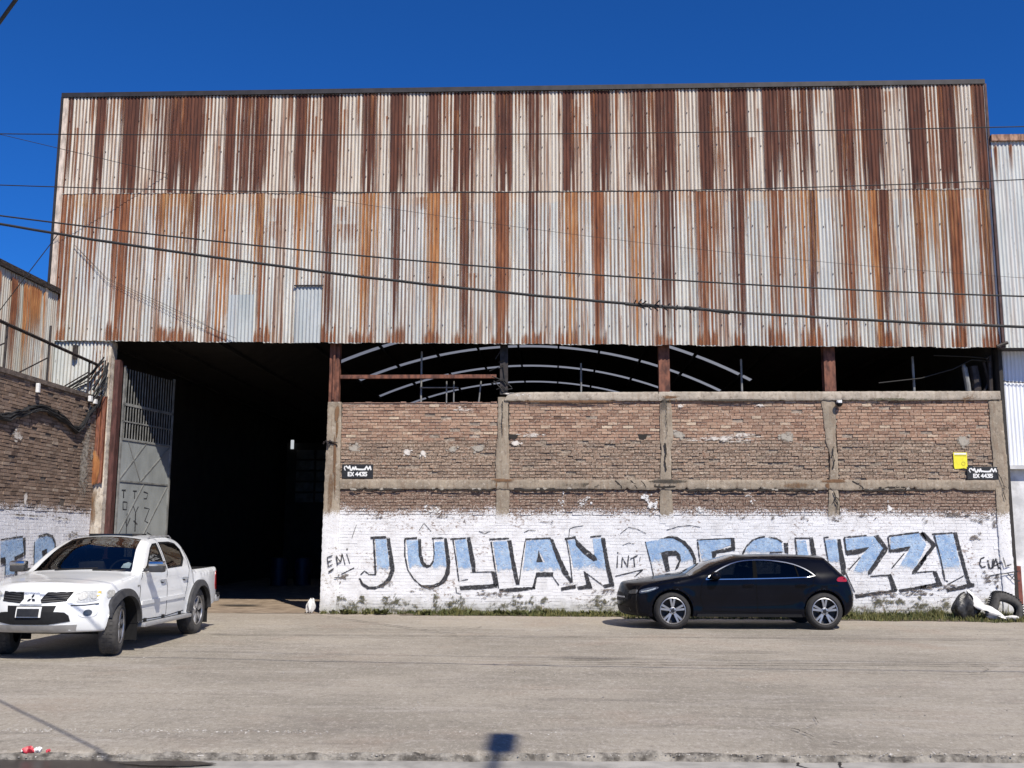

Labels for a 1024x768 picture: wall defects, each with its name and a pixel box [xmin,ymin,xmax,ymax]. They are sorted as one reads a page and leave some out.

corrosion [0,93,409,394]
corrosion [421,91,617,344]
corrosion [624,84,1012,347]
spalling [514,487,605,506]
spalling [682,487,818,501]
peeling [944,510,997,542]